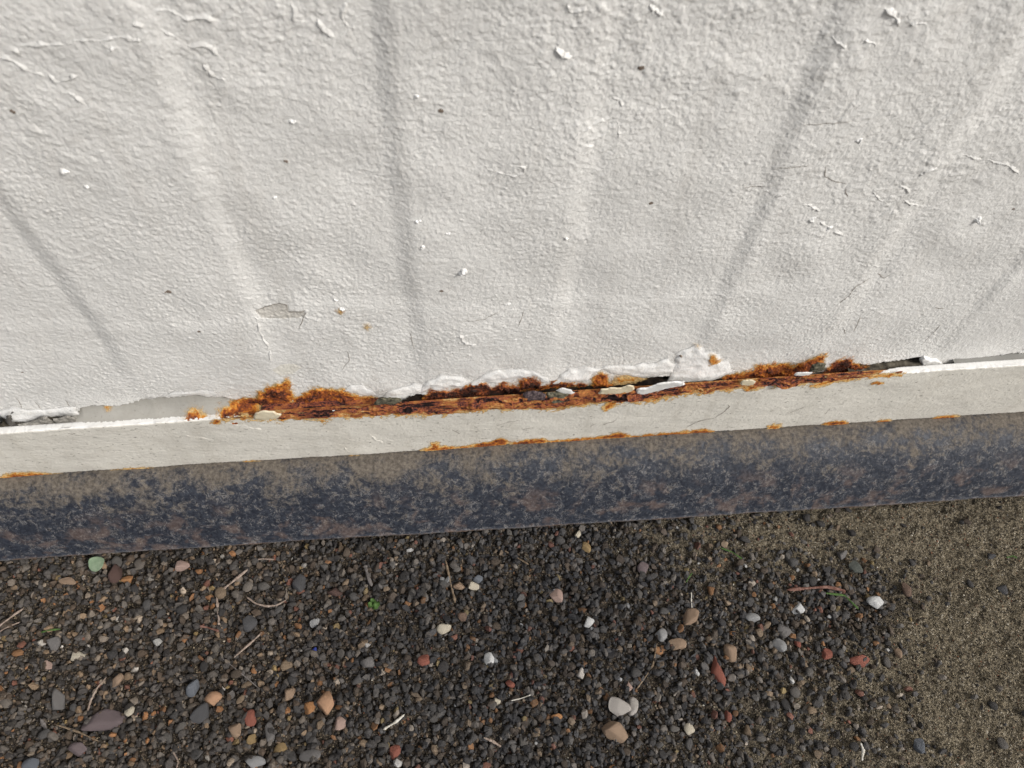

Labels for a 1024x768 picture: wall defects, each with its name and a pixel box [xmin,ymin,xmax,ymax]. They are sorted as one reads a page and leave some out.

peeling [254,304,306,319]
corrosion [185,353,907,425]
peeling [598,381,685,395]
corrosion [420,428,714,451]